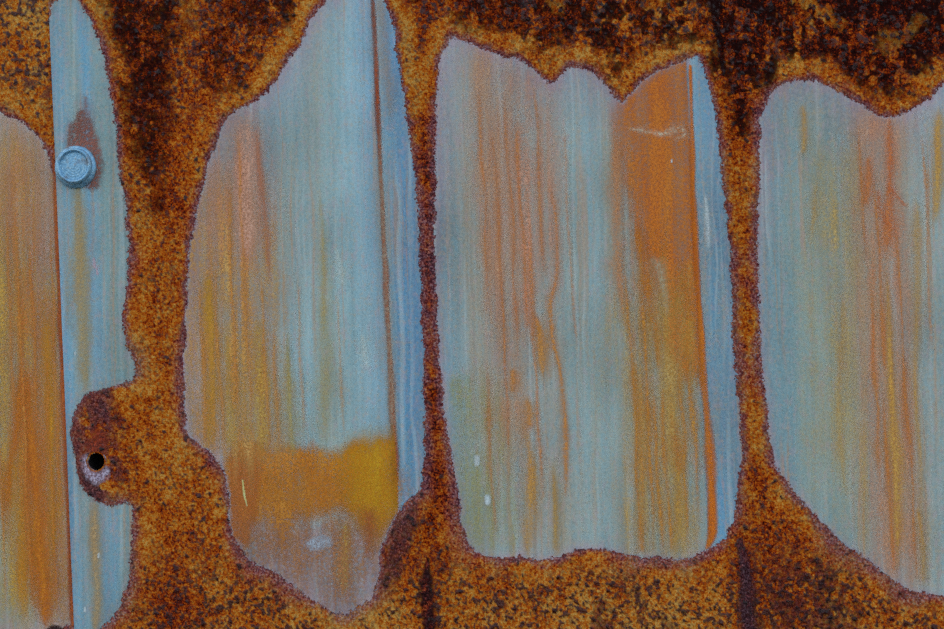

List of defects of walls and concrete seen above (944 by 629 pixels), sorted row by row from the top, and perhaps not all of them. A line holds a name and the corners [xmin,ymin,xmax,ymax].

rust [0,100,121,629]
rust [108,0,183,207]
rust [181,0,419,604]
rust [420,557,435,629]
rust [452,55,568,549]
rust [611,62,717,549]
rust [436,0,944,135]
rust [737,538,862,629]
rust [829,115,931,575]
rust [923,116,943,216]